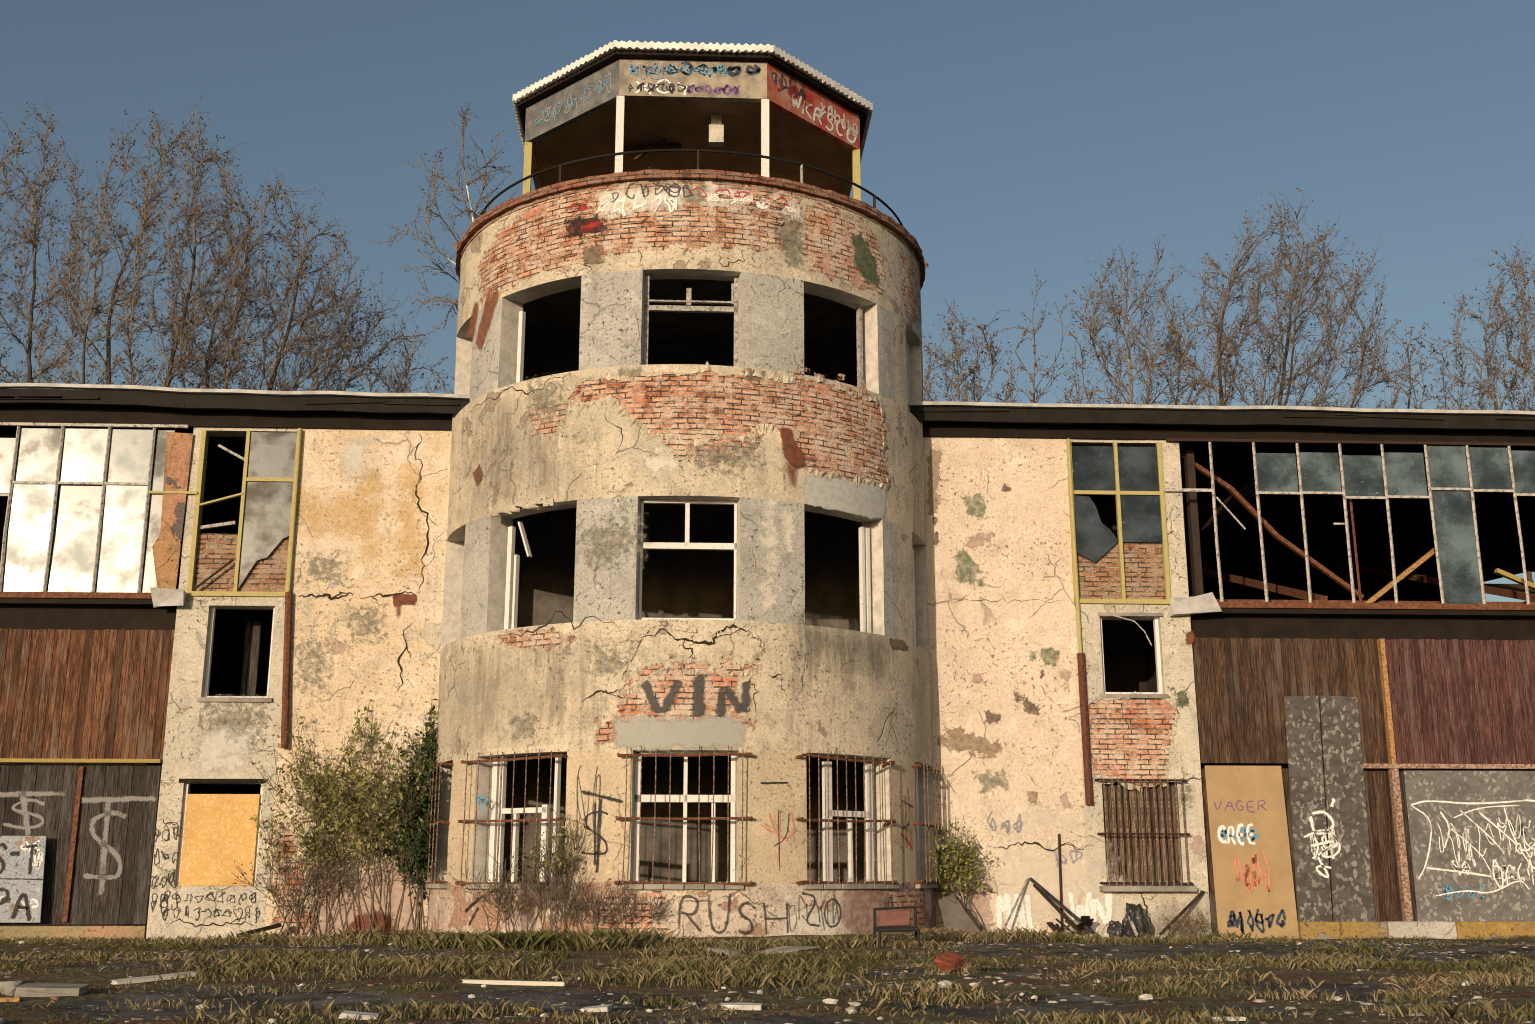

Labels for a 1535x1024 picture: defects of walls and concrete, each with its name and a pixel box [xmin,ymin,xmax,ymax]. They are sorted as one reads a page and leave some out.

flaking render [478,167,922,329]
flaking render [527,361,891,492]
crack [299,434,430,692]
peeling [756,489,802,613]
spalling [926,449,942,545]
peeling [952,493,995,586]
crack [497,611,785,716]
flaking render [590,618,766,748]
peeling [1029,647,1060,678]
peeling [934,692,1039,793]
flaking render [1079,691,1181,793]
peeling [1027,791,1041,806]